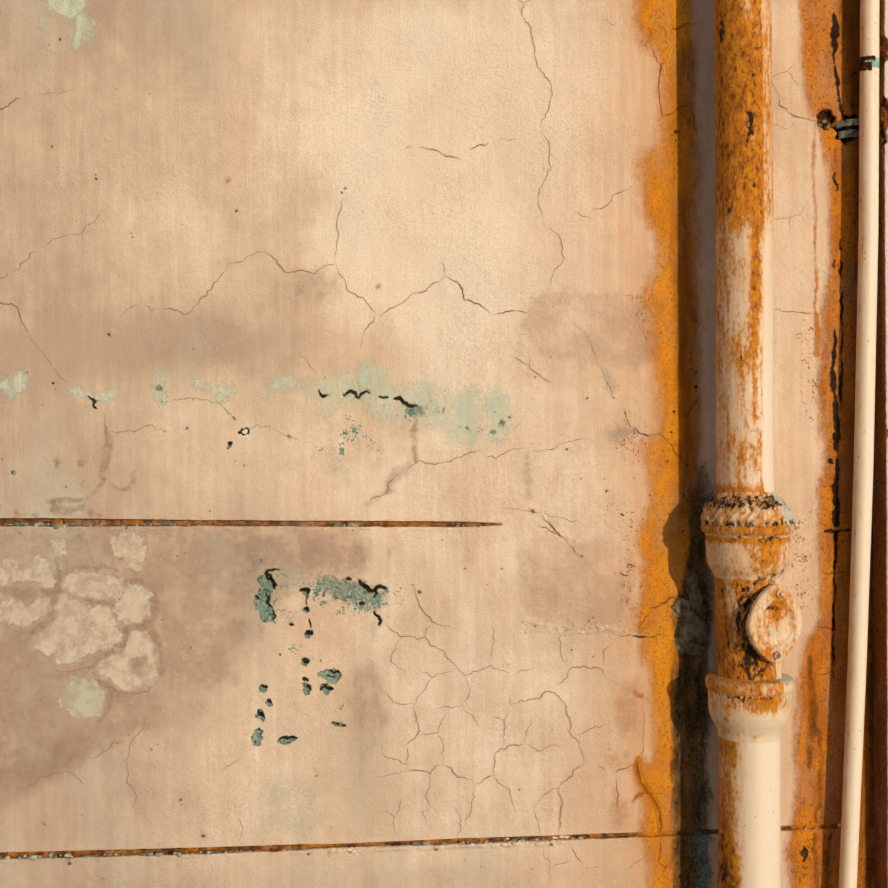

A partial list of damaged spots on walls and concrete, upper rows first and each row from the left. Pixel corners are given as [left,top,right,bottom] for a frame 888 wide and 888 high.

crack [519,0,564,276]
crack [125,200,525,347]
flaking render [339,415,379,455]
peeling [315,363,511,442]
corrosion [607,0,699,888]
corrosion [786,0,860,888]
flaking render [251,684,273,746]
flaking render [277,736,298,745]
flaking render [250,557,404,695]
crack [379,596,675,831]
crack [602,722,667,869]
damp [668,467,713,888]